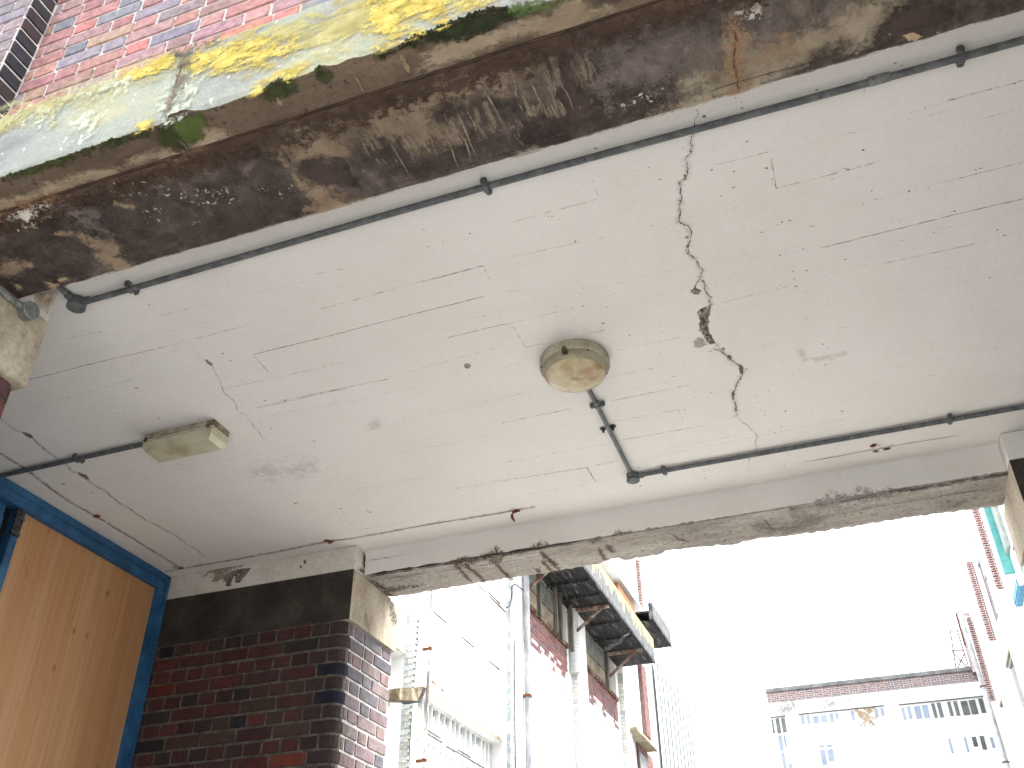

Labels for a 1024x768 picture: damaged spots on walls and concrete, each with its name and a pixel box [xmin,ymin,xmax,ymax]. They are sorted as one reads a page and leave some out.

corrosion [0,0,788,240]
damp [0,0,1014,288]
crack [677,15,847,309]
spalling [694,306,716,347]
crack [192,349,263,438]
crack [715,344,758,468]
damp [789,472,1008,519]
peeling [223,567,252,587]